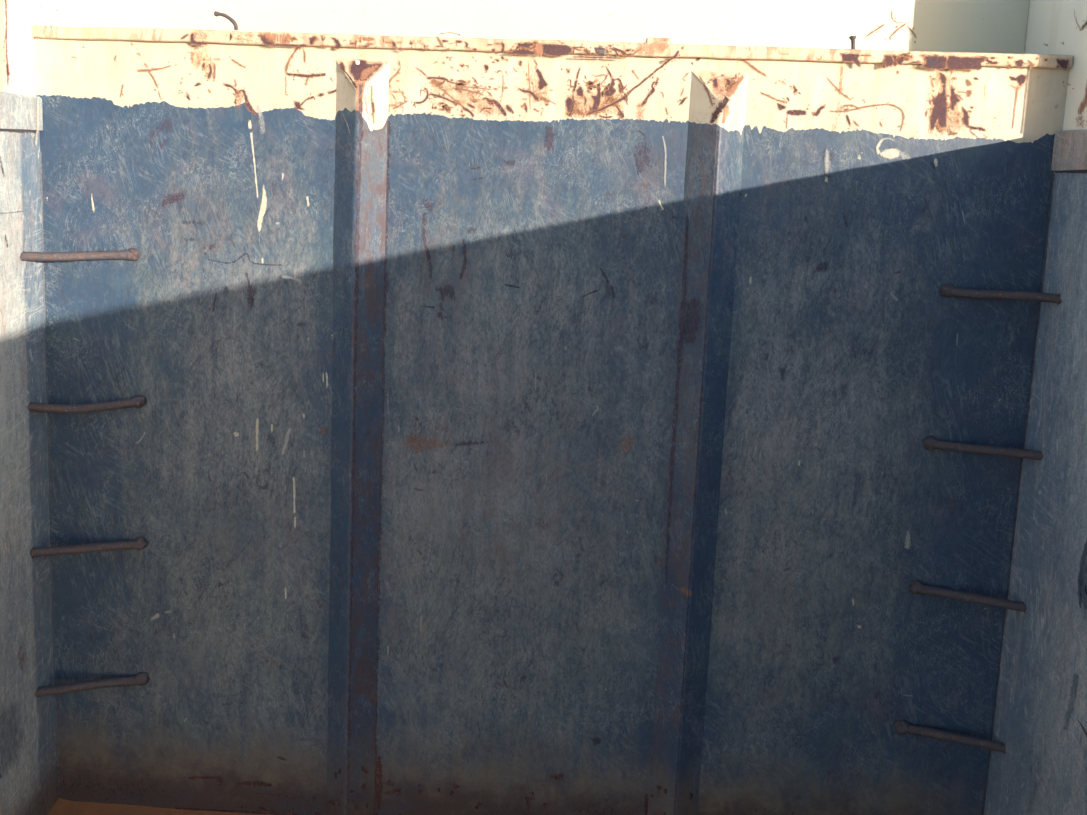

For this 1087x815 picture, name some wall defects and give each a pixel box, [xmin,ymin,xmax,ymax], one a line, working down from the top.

corrosion [226,32,373,49]
spalling [338,59,383,88]
corrosion [467,41,683,119]
spalling [561,64,628,120]
corrosion [634,78,658,175]
spalling [699,73,754,127]
peeling [776,80,826,116]
corrosion [839,52,1069,129]
corrosion [1076,88,1087,127]
corrosion [377,32,476,689]
corrosion [328,80,421,815]
corrosion [644,131,720,815]